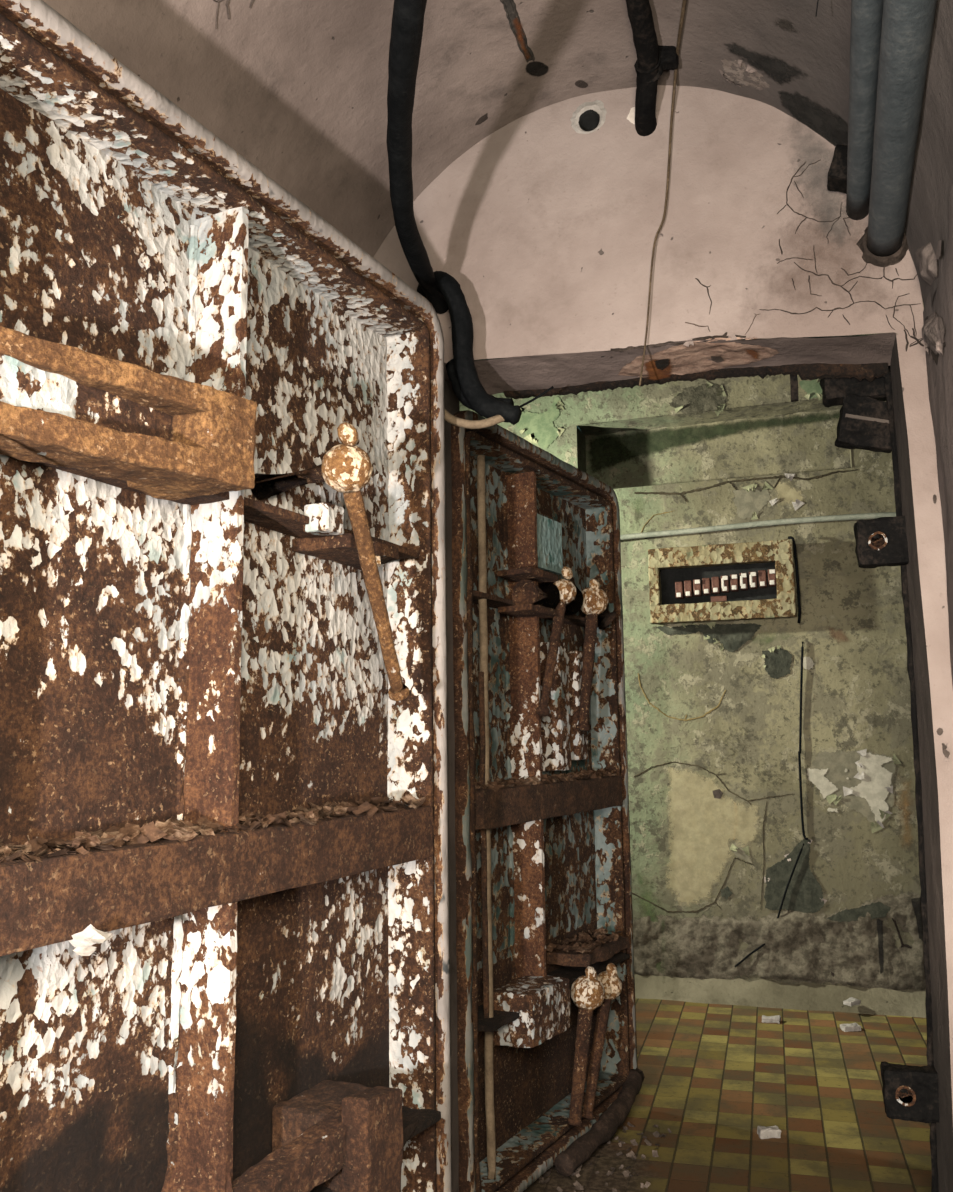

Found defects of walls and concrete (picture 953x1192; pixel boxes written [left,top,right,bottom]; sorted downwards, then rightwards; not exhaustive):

crack [213,0,254,29]
damp [727,43,802,84]
crack [610,160,941,352]
rust [475,768,616,792]
peeling [807,749,901,833]
rust [0,793,426,864]
spalling [633,768,926,990]